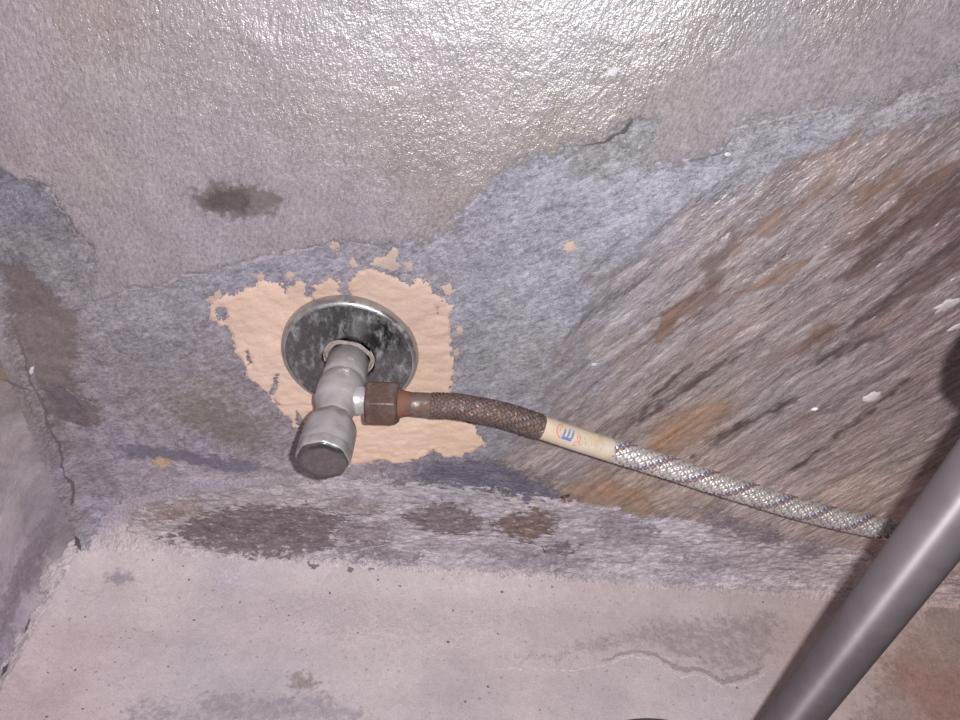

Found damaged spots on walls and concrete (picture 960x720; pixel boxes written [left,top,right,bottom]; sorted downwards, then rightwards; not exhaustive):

water stain [193,181,282,218]
crack [3,327,75,505]
water stain [0,262,101,426]
spalling [0,61,960,593]
spalling [926,571,960,608]